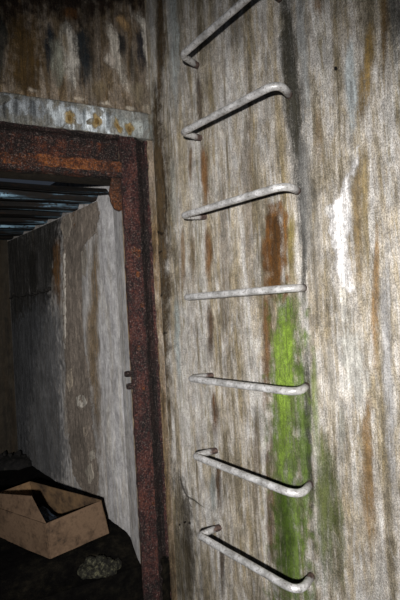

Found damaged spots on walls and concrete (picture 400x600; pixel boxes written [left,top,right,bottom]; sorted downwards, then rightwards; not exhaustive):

damp [0,0,149,134]
rust [92,113,102,129]
rust [114,117,134,135]
damp [279,0,312,284]
rust [53,244,61,302]
rust [86,232,100,422]
rust [262,202,294,385]
damp [326,147,369,400]
rust [267,489,275,558]
damp [266,293,341,584]